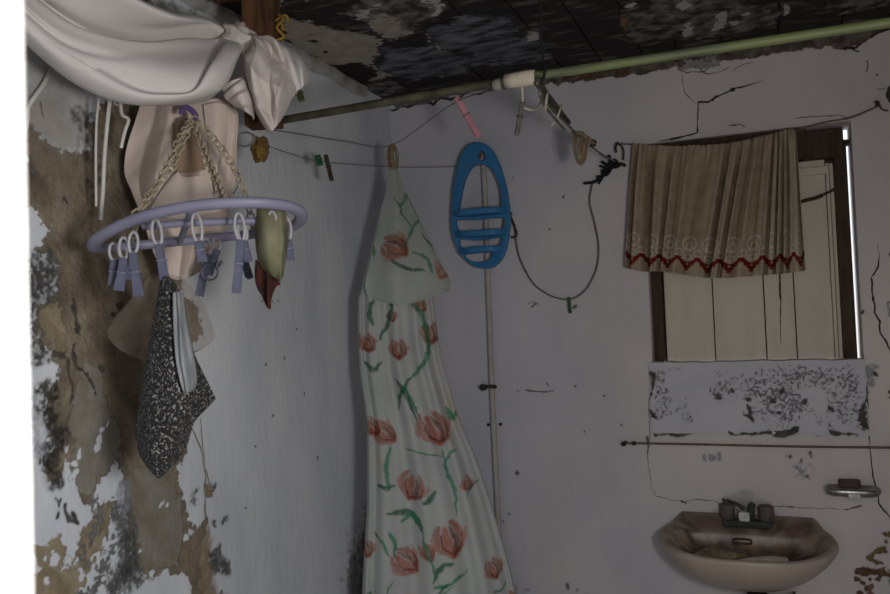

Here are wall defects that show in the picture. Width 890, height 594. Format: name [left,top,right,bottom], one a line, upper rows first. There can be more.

damp [24,95,72,140]
peeling [280,0,555,97]
peeling [619,0,790,46]
crack [658,62,761,142]
spalling [543,29,883,86]
crack [796,112,848,120]
damp [27,250,61,366]
peeling [24,101,211,594]
crack [870,245,890,351]
peeling [710,365,868,438]
crack [646,396,740,512]
crack [773,386,890,517]